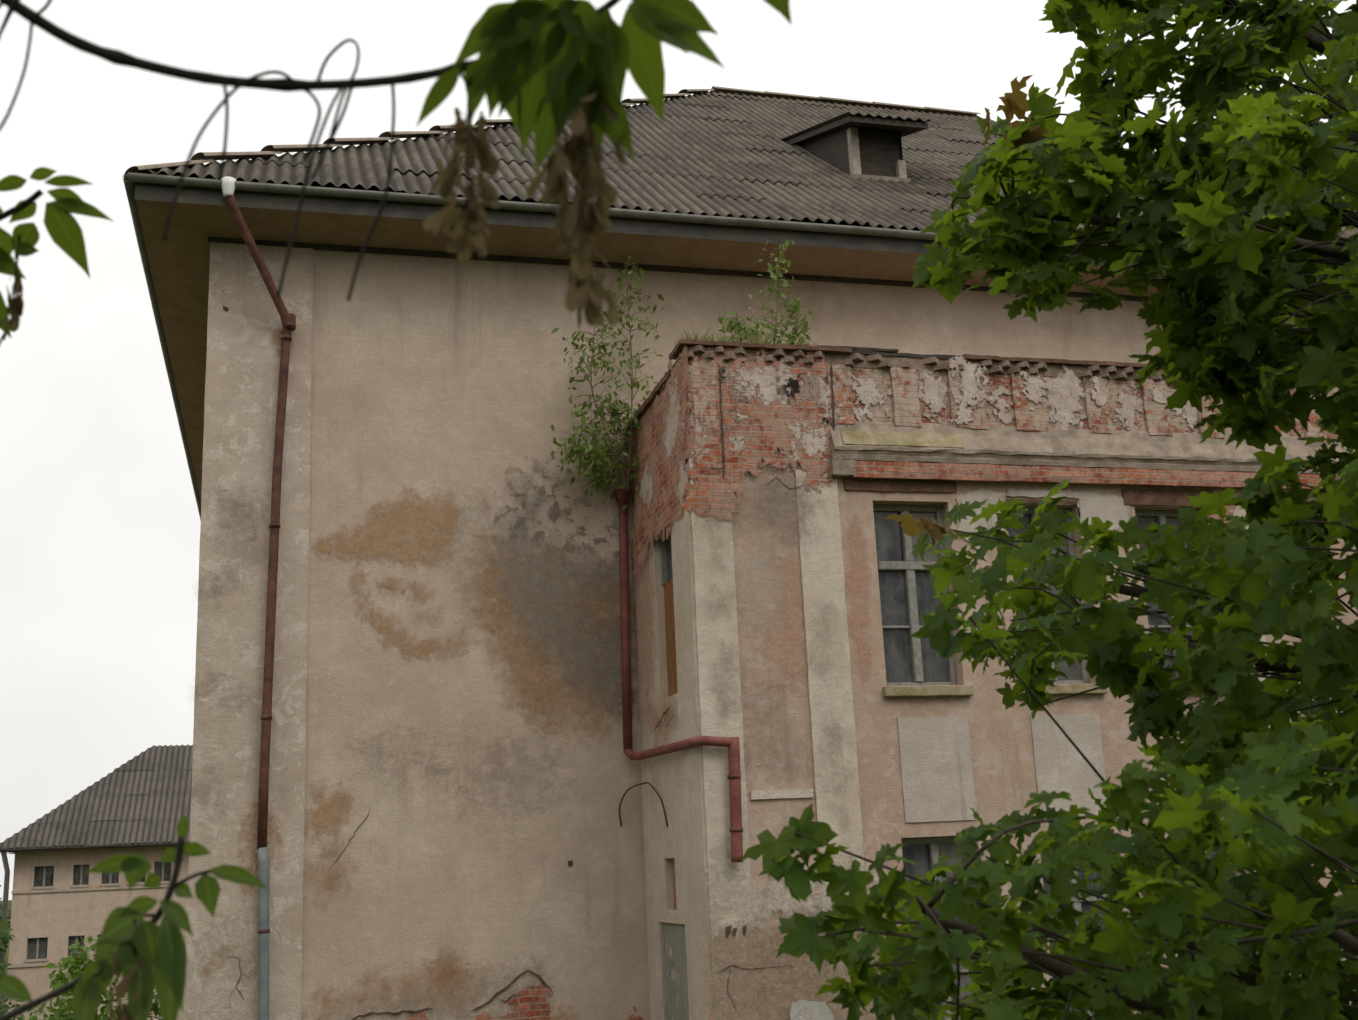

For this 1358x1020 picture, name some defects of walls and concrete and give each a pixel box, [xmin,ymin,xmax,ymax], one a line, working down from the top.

flaking render [662,340,893,525]
peeling [639,462,653,516]
spalling [318,968,569,1020]